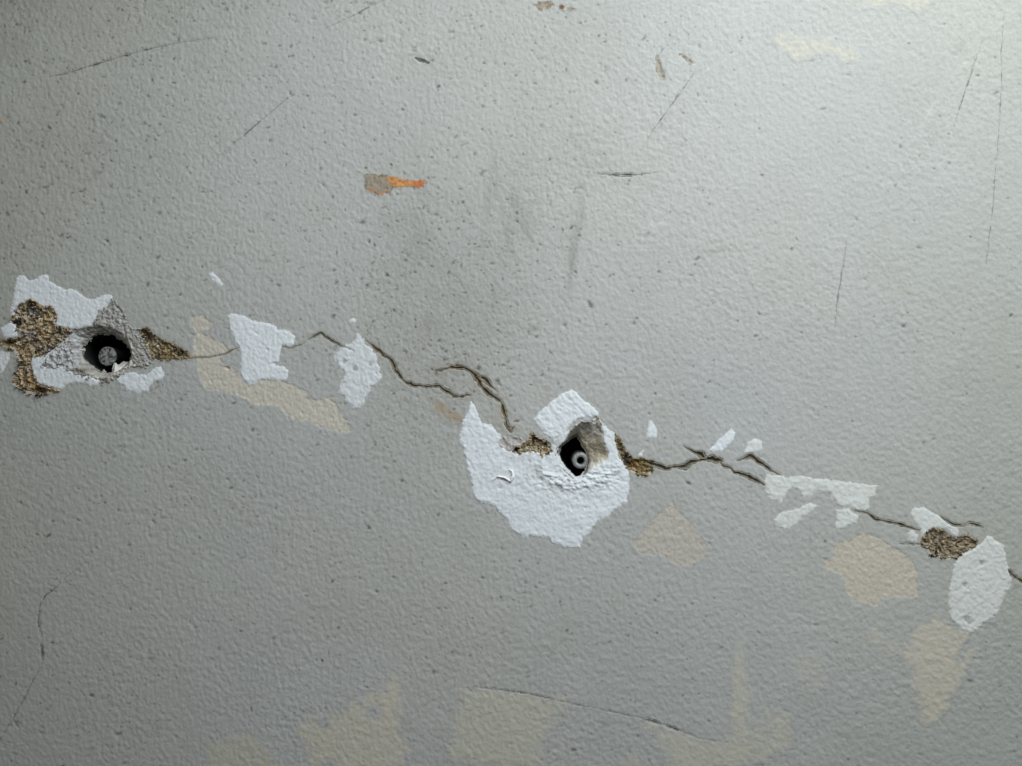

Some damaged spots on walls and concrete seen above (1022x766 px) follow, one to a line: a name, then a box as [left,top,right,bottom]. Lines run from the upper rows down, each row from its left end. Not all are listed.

corrosion [364,172,429,196]
crack [834,239,847,328]
flaking render [0,274,382,433]
crack [191,347,240,359]
crack [281,331,520,432]
peeling [459,389,654,549]
peeling [646,420,657,438]
crack [651,445,780,486]
flaking render [764,474,918,608]
crack [855,510,984,545]
peeling [907,507,1012,633]
crack [1008,569,1022,583]